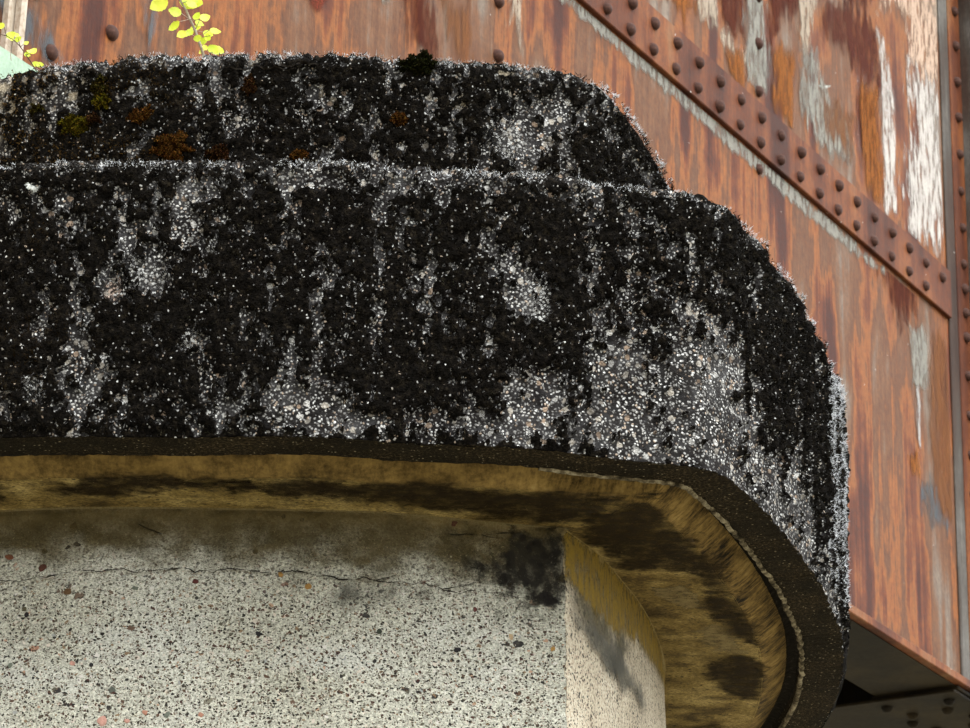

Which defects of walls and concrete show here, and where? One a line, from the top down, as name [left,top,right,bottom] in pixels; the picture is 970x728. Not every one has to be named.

corrosion [722,0,747,36]
corrosion [768,0,799,128]
corrosion [820,0,885,202]
corrosion [877,265,918,323]
corrosion [927,335,953,520]
leakage [47,472,760,646]
leakage [576,618,643,708]
leakage [704,656,769,700]